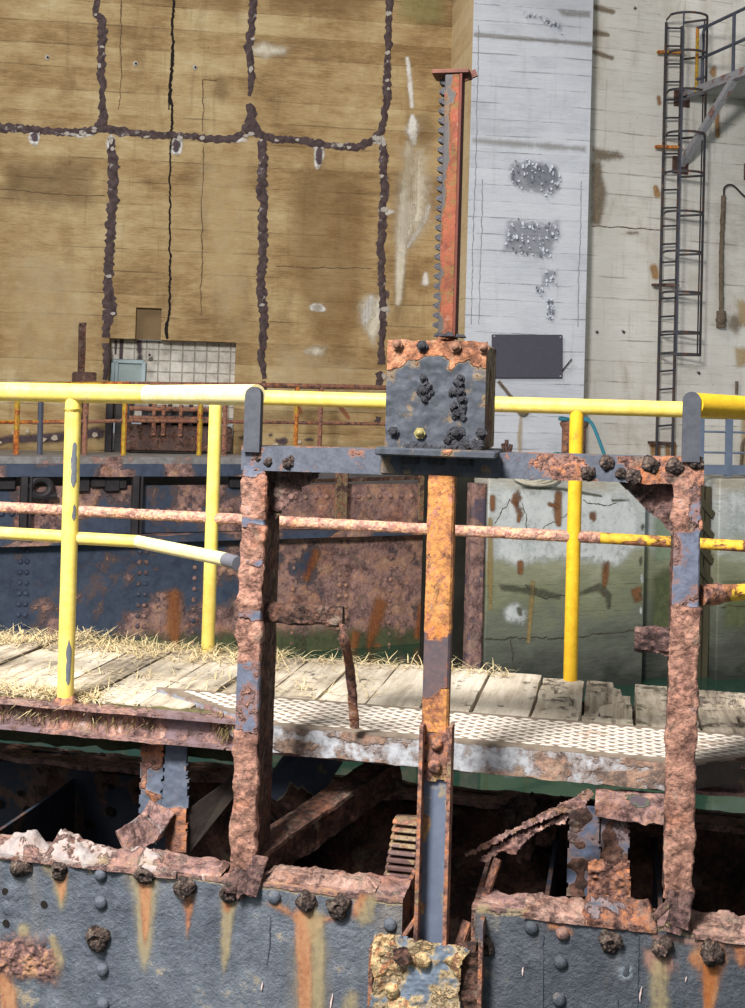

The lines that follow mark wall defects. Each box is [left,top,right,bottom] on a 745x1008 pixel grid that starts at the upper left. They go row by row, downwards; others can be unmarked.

crack [0,0,394,390]
leakage [396,57,430,305]
peeling [510,159,561,196]
leakage [501,585,560,599]
leakage [583,584,611,608]
rust [0,828,231,961]
rust [263,864,381,920]
rust [0,926,62,1008]
rust [275,905,329,1008]
rust [457,940,478,1008]
rust [646,952,673,1008]
rust [685,910,745,1008]